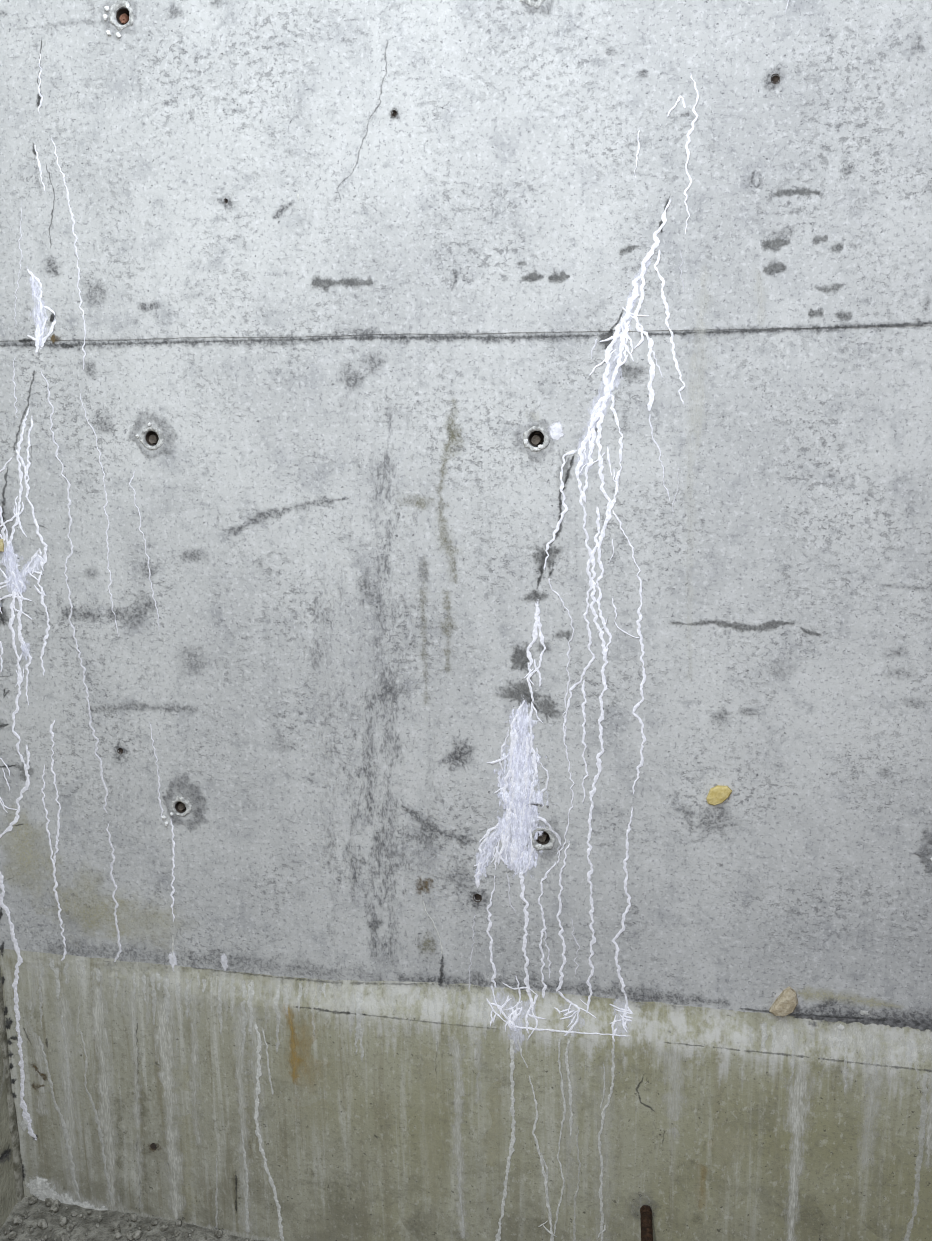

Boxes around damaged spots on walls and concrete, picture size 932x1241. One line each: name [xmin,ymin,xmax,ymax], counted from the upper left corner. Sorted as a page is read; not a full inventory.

water stain [14,204,58,353]
water stain [51,138,101,375]
crack [599,312,622,379]
crack [524,456,574,602]
crack [0,599,8,624]
crack [503,631,570,717]
water stain [402,74,699,1241]
water stain [0,359,364,1241]
efflorescence [762,1021,810,1241]